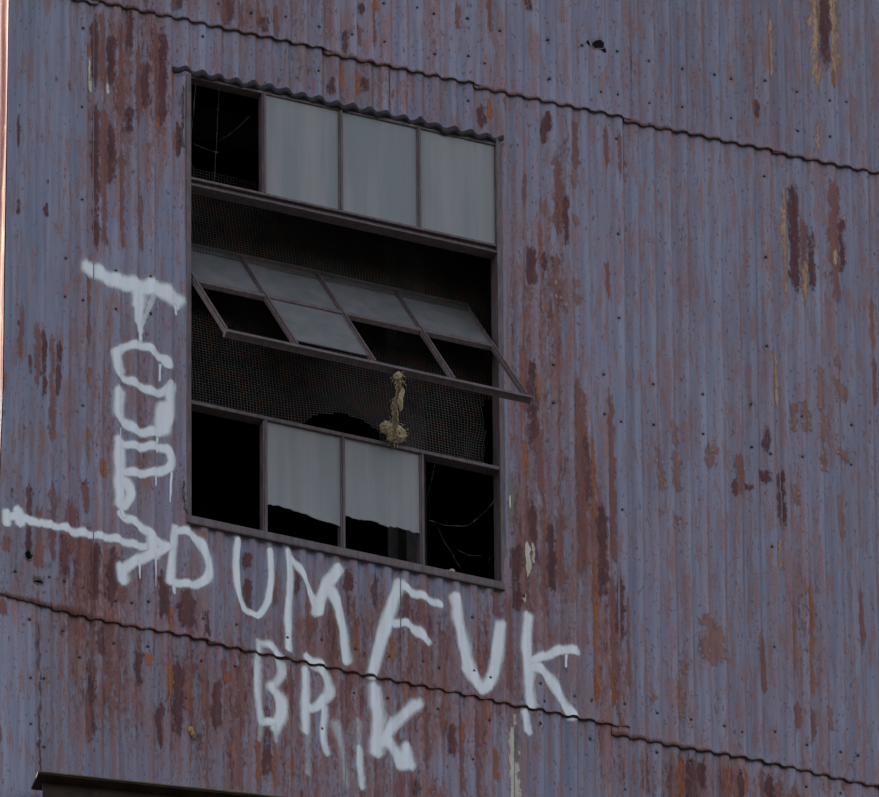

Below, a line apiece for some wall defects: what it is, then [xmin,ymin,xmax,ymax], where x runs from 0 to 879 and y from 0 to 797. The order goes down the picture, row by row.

corrosion [540,111,554,144]
corrosion [551,118,581,245]
corrosion [779,178,817,304]
corrosion [827,178,846,303]
peeling [789,353,850,472]
corrosion [158,569,211,636]
corrosion [242,553,253,610]
corrosion [292,556,319,638]
corrosion [490,547,523,697]
corrosion [528,372,631,705]
peeling [697,613,731,666]
corrosion [155,654,231,750]